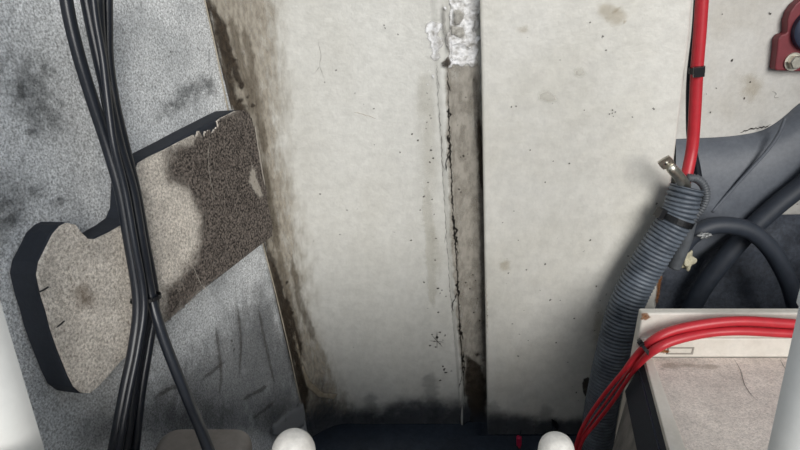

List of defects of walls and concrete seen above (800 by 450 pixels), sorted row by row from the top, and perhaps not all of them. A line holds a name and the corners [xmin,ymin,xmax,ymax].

water stain [164,0,582,438]
crack [445,67,466,408]